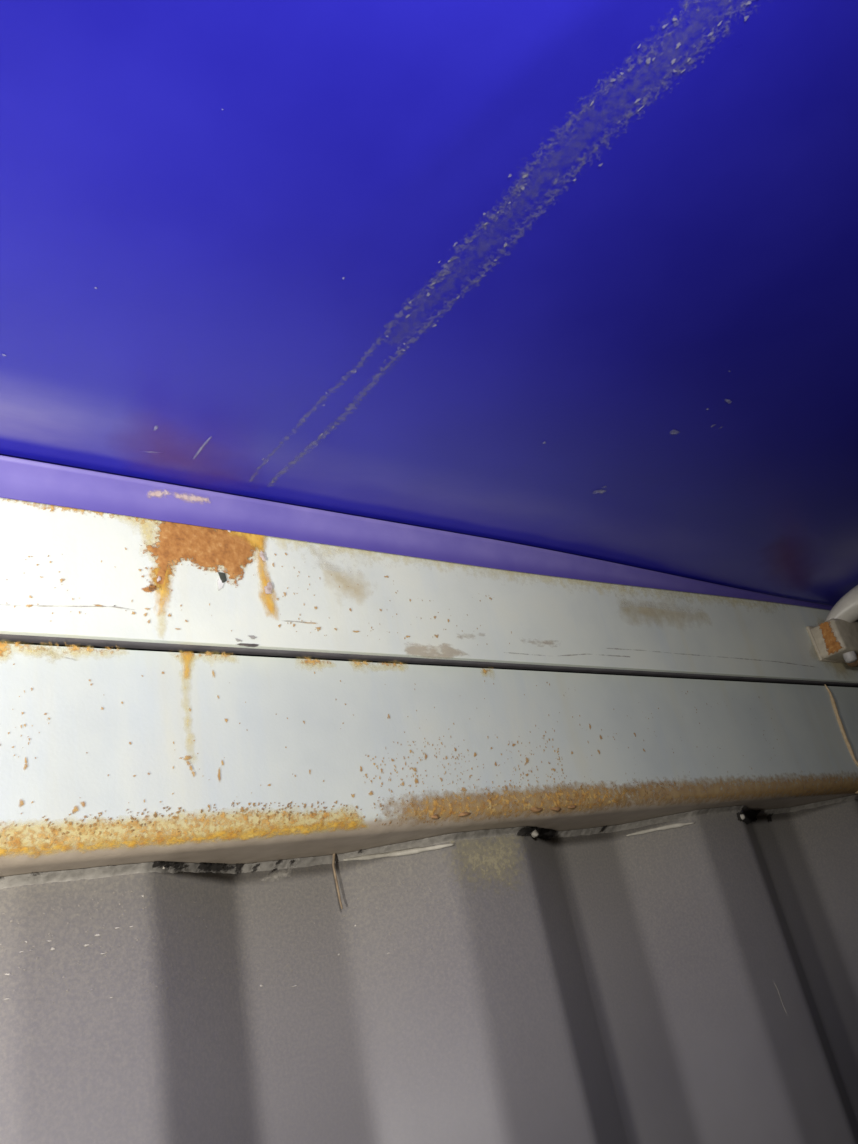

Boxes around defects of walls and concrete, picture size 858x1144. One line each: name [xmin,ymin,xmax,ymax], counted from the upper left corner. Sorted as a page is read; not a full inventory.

rust [132,518,337,636]
rust [182,652,227,676]
rust [0,712,858,855]